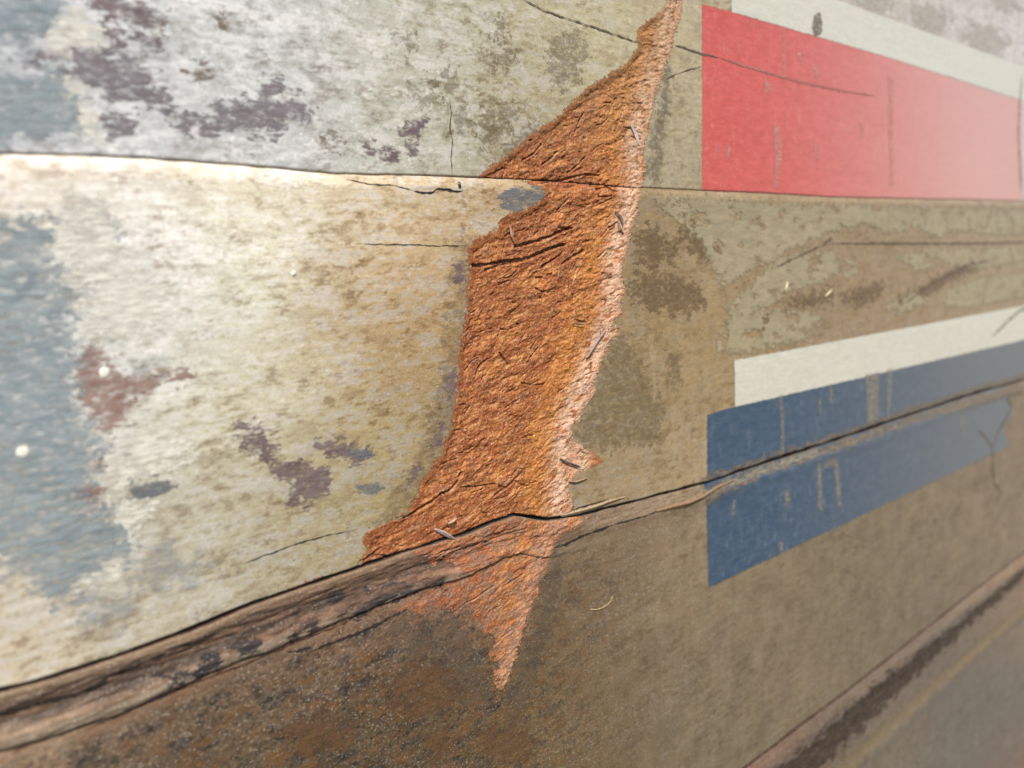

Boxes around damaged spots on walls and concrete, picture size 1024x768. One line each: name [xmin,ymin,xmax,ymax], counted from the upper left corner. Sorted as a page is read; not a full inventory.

crack [525,0,641,43]
crack [665,45,874,96]
crack [347,103,461,194]
crack [244,531,347,564]
crack [553,500,656,548]
crack [0,633,214,715]
crack [77,603,416,733]